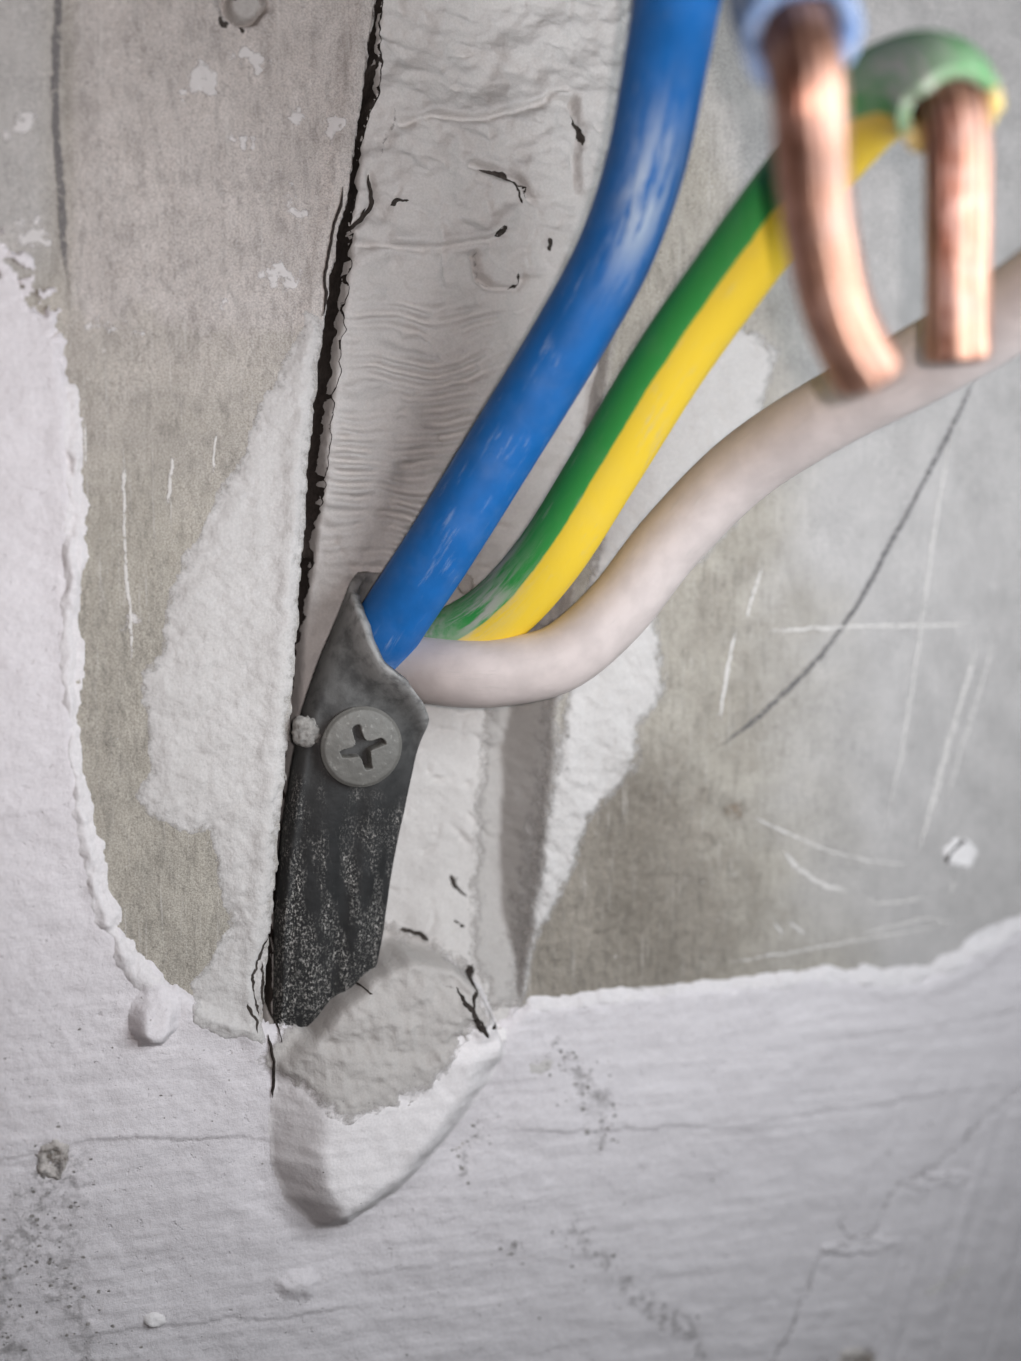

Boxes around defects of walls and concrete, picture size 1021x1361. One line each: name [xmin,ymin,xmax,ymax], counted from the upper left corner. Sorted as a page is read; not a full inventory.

crack [290,0,409,717]
peeling [59,382,164,992]
spalling [944,838,978,870]
crack [247,753,287,1098]
crack [400,875,467,942]
crack [456,965,497,1038]
peeling [526,915,1021,1012]